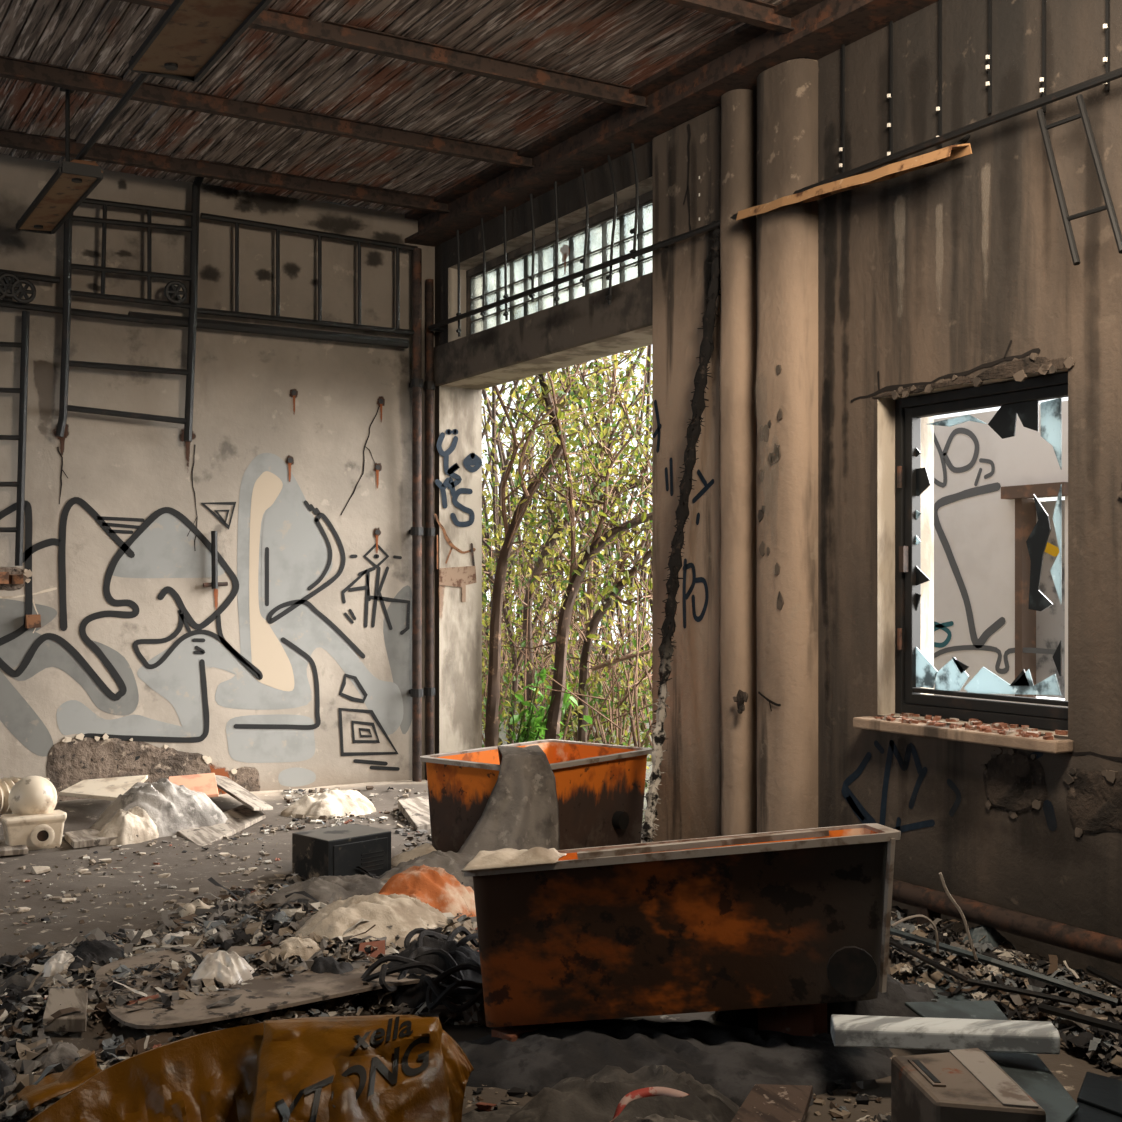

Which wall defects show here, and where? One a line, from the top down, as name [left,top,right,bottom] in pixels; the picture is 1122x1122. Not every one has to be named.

crack [340,406,379,515]
crack [1070,751,1122,762]